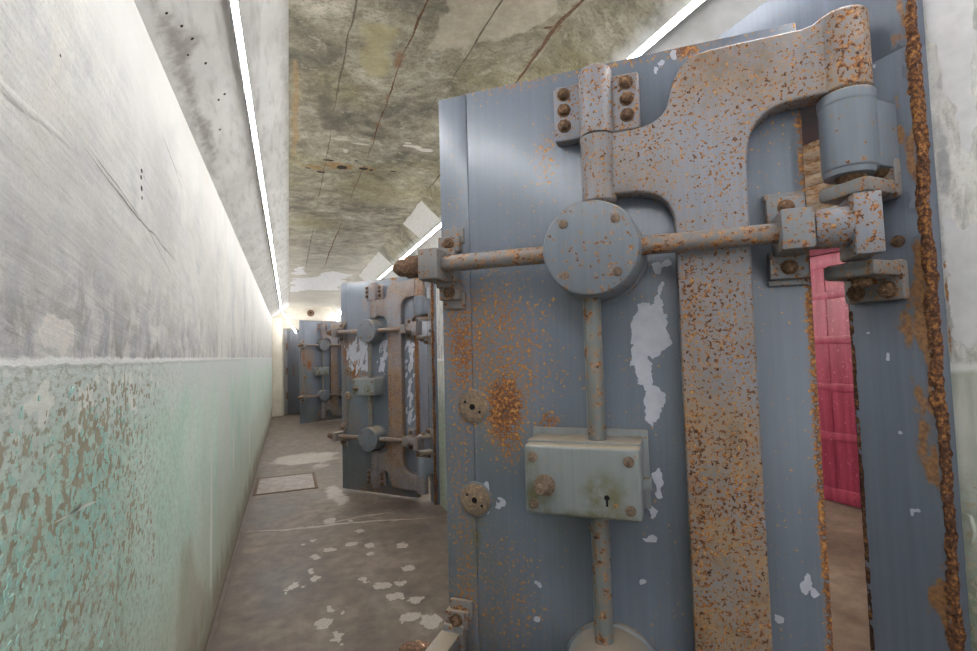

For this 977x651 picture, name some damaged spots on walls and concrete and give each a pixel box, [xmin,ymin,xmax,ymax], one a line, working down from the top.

crack [86,146,176,271]
crack [306,0,358,267]
leakage [289,14,409,158]
crack [350,0,429,199]
leakage [402,142,434,152]
crack [423,0,503,118]
crack [515,0,585,83]
peeling [0,362,185,651]